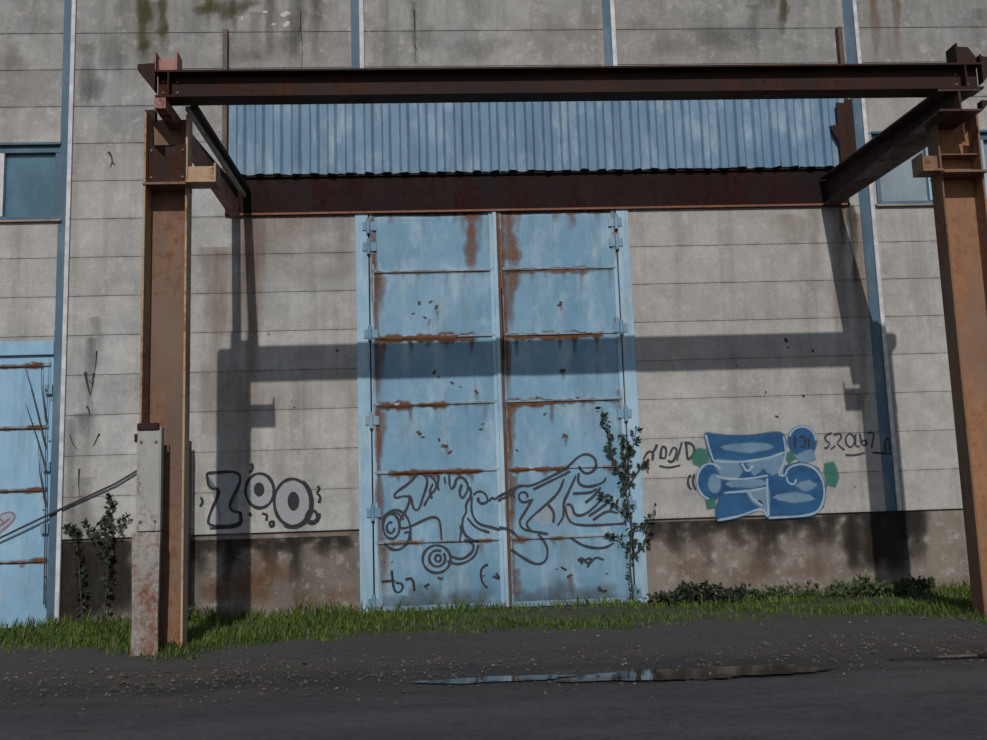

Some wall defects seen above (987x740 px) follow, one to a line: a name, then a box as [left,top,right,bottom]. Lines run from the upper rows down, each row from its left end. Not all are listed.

water stain [137,0,166,50]
corrosion [371,212,478,369]
corrosion [498,210,616,375]
corrosion [375,401,482,505]
water stain [191,536,350,570]
water stain [649,510,926,569]